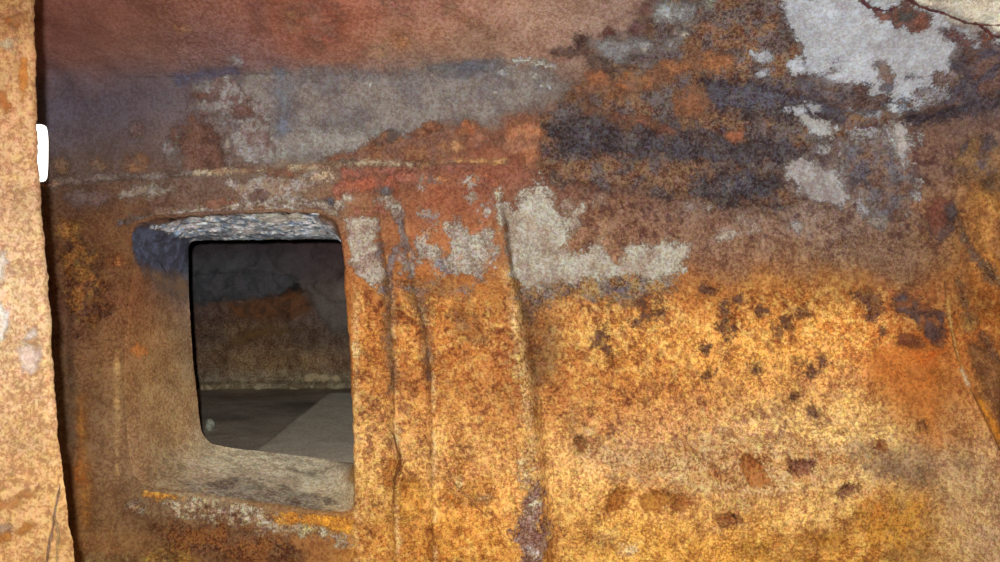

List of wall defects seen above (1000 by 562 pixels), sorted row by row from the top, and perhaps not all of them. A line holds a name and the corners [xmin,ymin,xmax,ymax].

damp [41,0,1000,220]
crack [392,434,416,503]